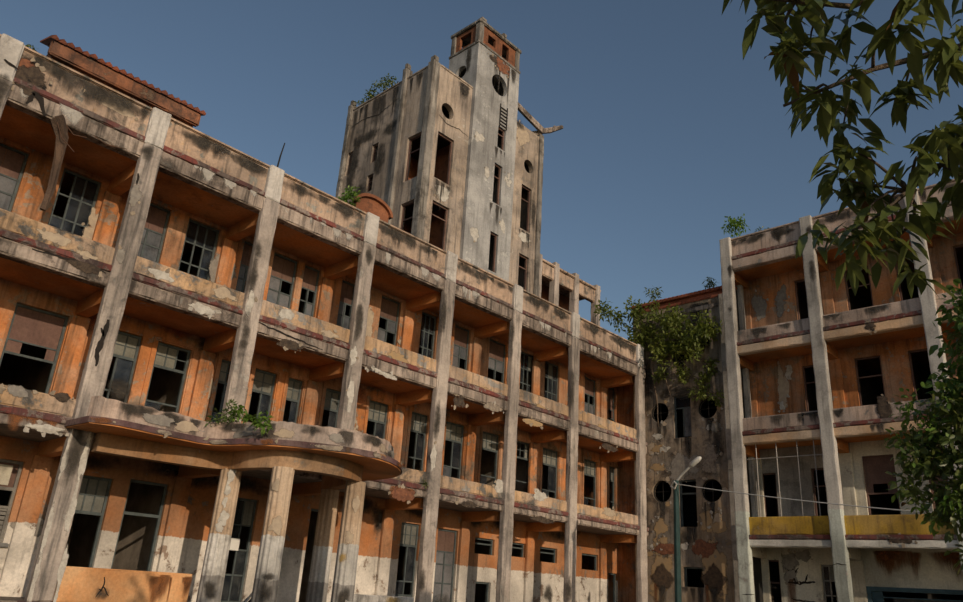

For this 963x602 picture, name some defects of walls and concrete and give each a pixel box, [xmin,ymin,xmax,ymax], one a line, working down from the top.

water stain [289,86,398,218]
crack [259,322,323,350]
peeling [777,361,793,413]
spalling [23,418,116,602]
rust [874,550,921,571]
rust [933,552,961,573]
crack [788,568,815,602]